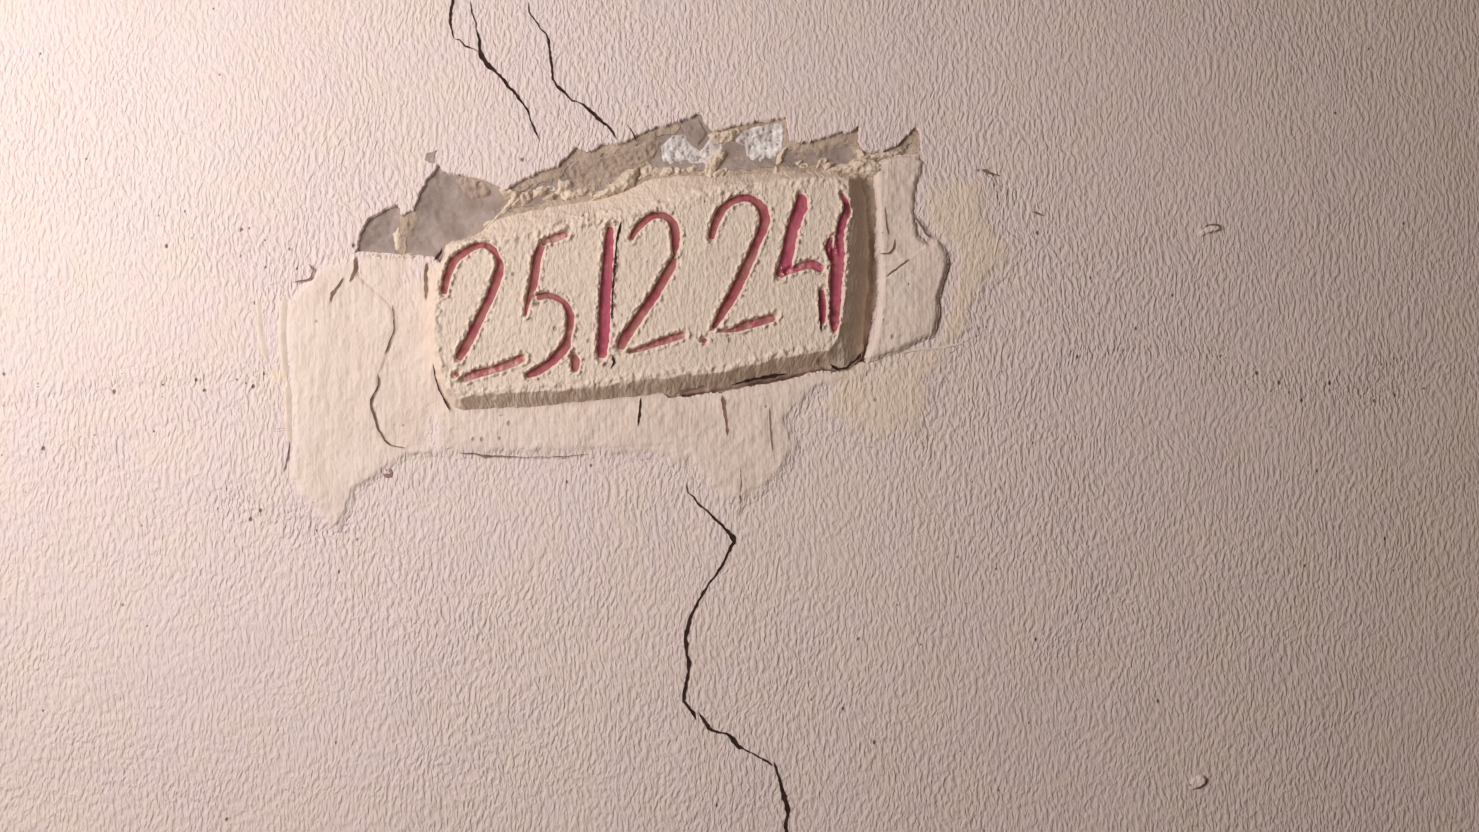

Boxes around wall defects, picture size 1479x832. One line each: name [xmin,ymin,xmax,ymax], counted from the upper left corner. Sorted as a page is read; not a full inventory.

crack [449,0,539,139]
crack [528,3,637,141]
spalling [329,114,920,363]
peeling [370,376,404,448]
spalling [682,369,835,397]
crack [682,469,790,832]